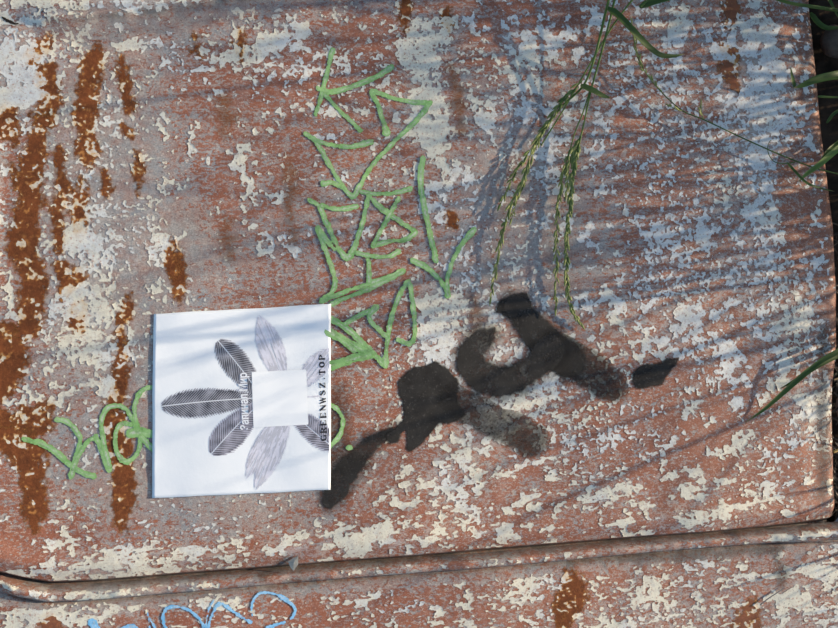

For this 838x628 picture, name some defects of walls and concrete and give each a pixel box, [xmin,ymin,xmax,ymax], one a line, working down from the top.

corrosion [720,0,741,30]
corrosion [717,43,740,94]
peeling [226,108,306,262]
peeling [0,252,26,323]
corrosion [0,31,146,535]
corrosion [163,241,188,302]
peeling [389,204,576,391]
corrosion [40,616,63,628]
peeling [6,510,259,581]
peeling [0,581,310,628]
corrosion [551,569,591,628]
peeling [320,529,838,628]